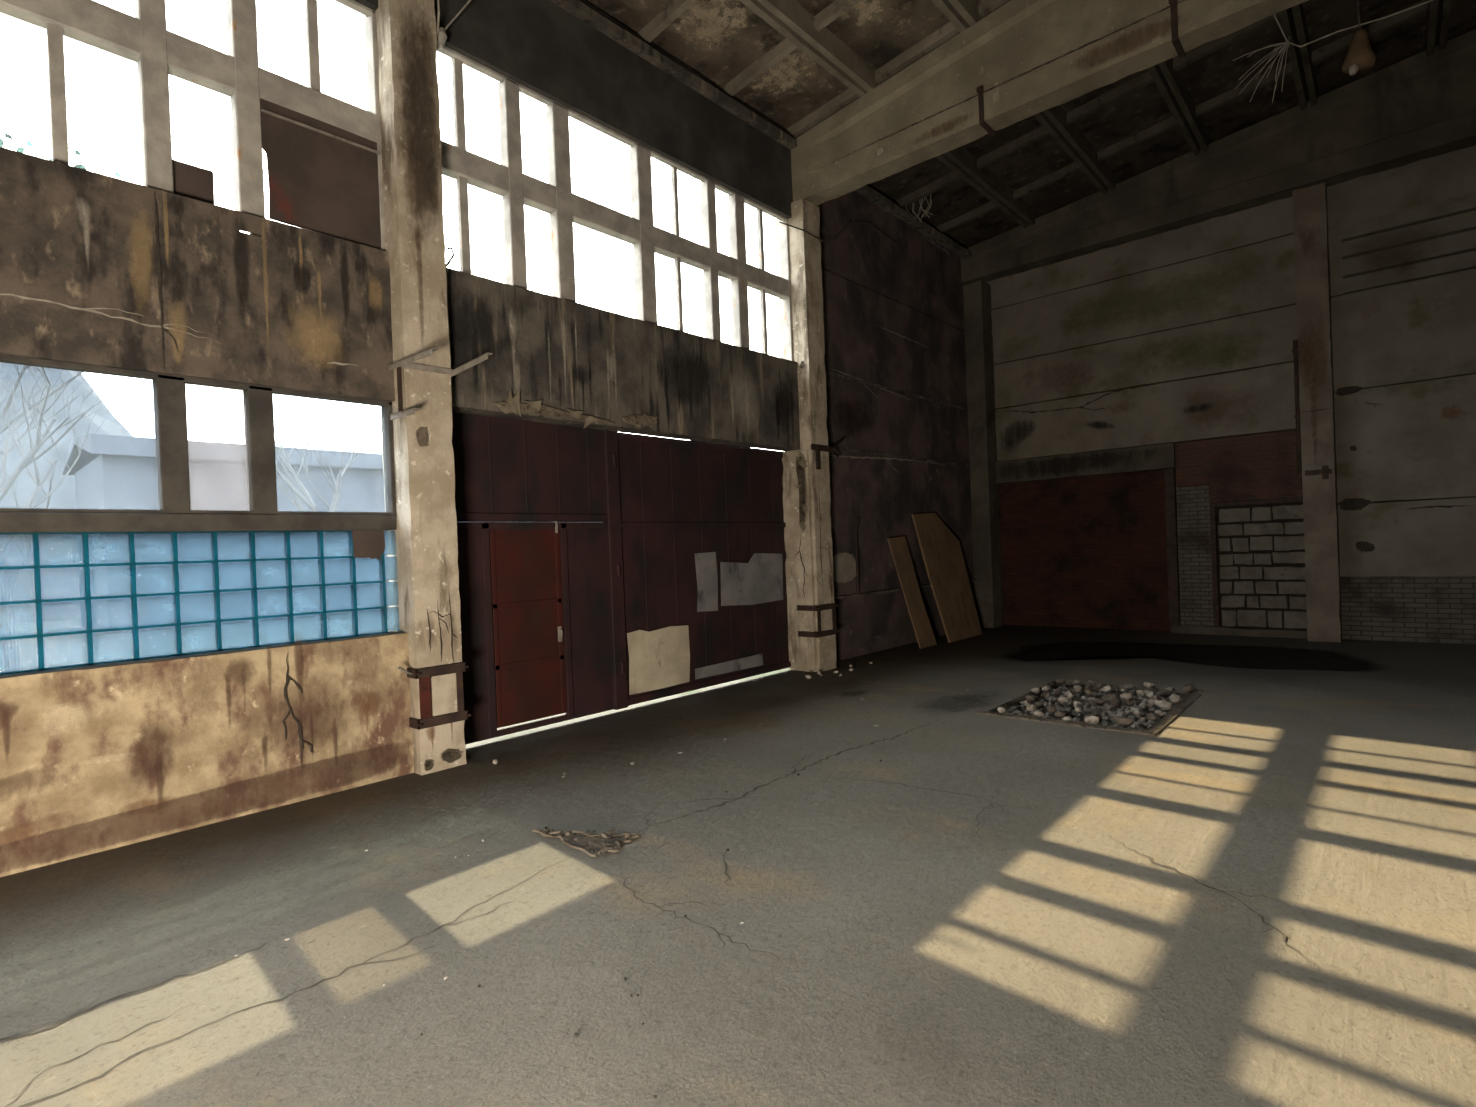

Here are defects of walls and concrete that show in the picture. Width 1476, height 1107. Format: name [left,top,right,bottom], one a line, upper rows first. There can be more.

damp [234,225,248,313]
damp [340,254,349,316]
damp [0,707,399,864]
crack [636,718,1003,839]
crack [620,851,801,962]
crack [0,852,576,1107]